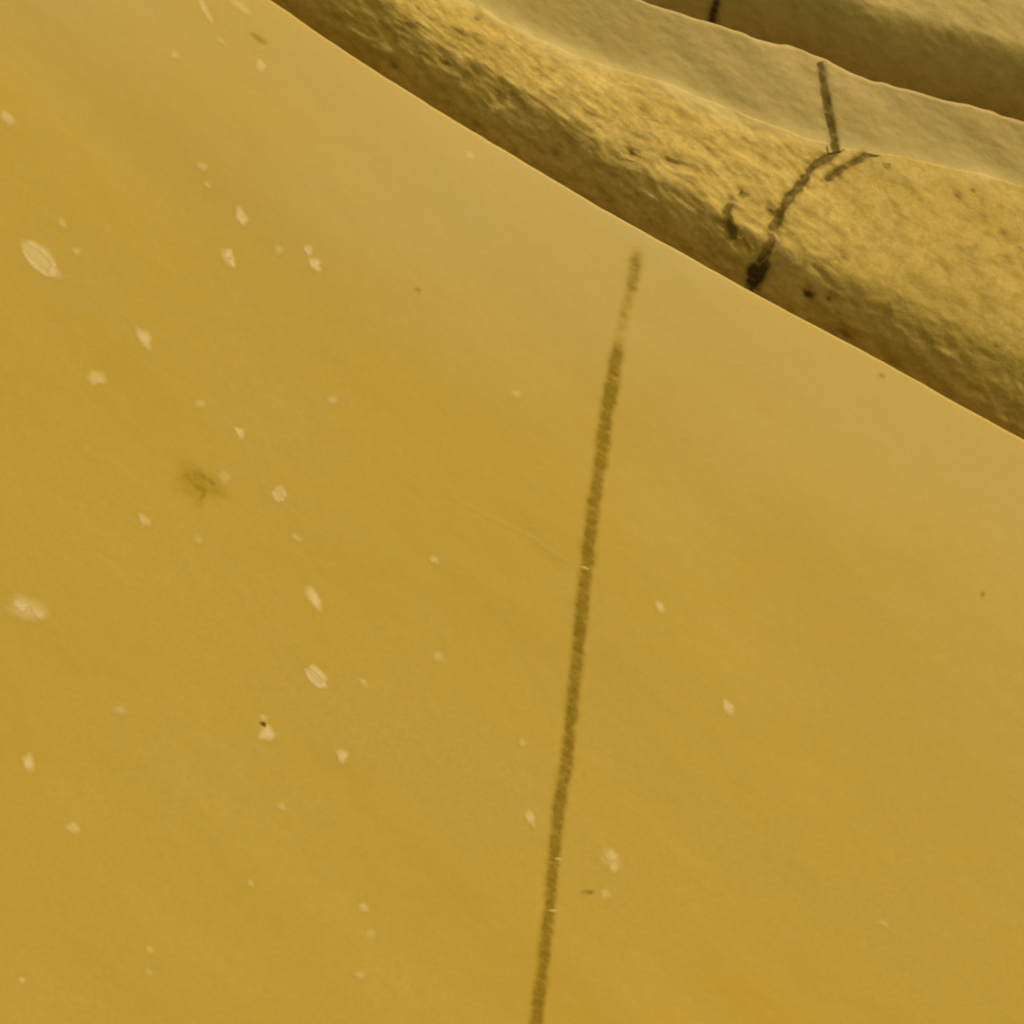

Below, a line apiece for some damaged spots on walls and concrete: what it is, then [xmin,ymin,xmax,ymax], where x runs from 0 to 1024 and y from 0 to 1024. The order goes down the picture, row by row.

crack [704,0,723,25]
crack [718,60,893,294]
peeling [233,202,251,228]
peeling [17,237,64,281]
peeling [302,243,323,275]
peeling [2,589,56,626]
peeling [302,582,324,615]
crack [526,242,647,1024]
peeling [303,663,329,690]
peeling [255,713,278,744]